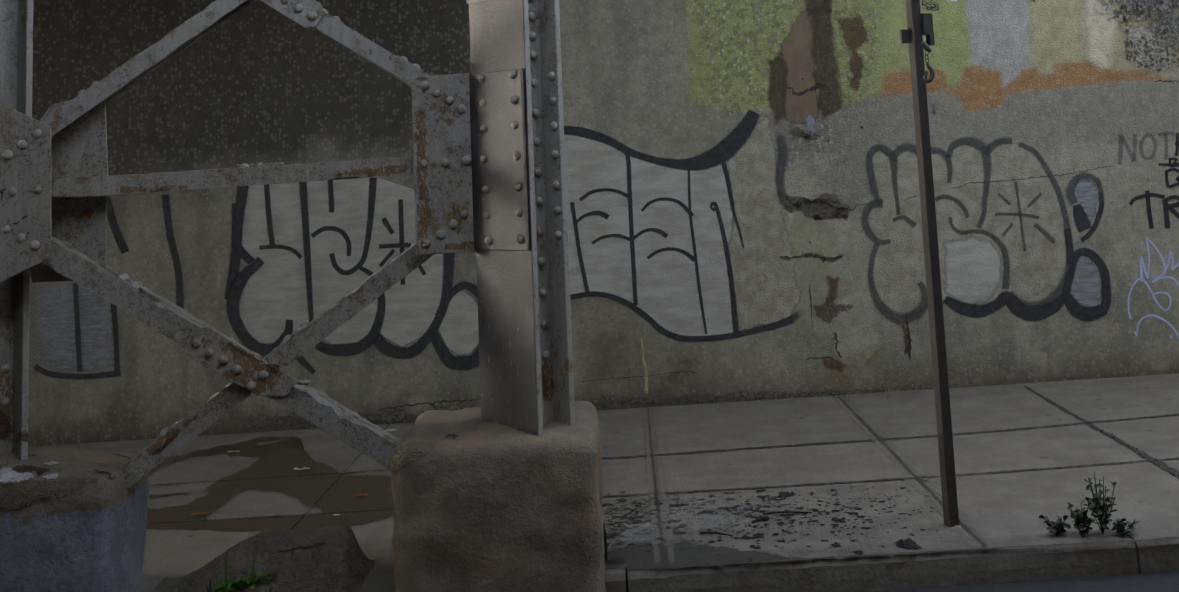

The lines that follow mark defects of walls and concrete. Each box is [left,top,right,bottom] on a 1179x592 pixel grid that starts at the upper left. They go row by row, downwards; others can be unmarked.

spalling [780,193,851,220]
rust [222,342,281,395]
rust [0,366,28,443]